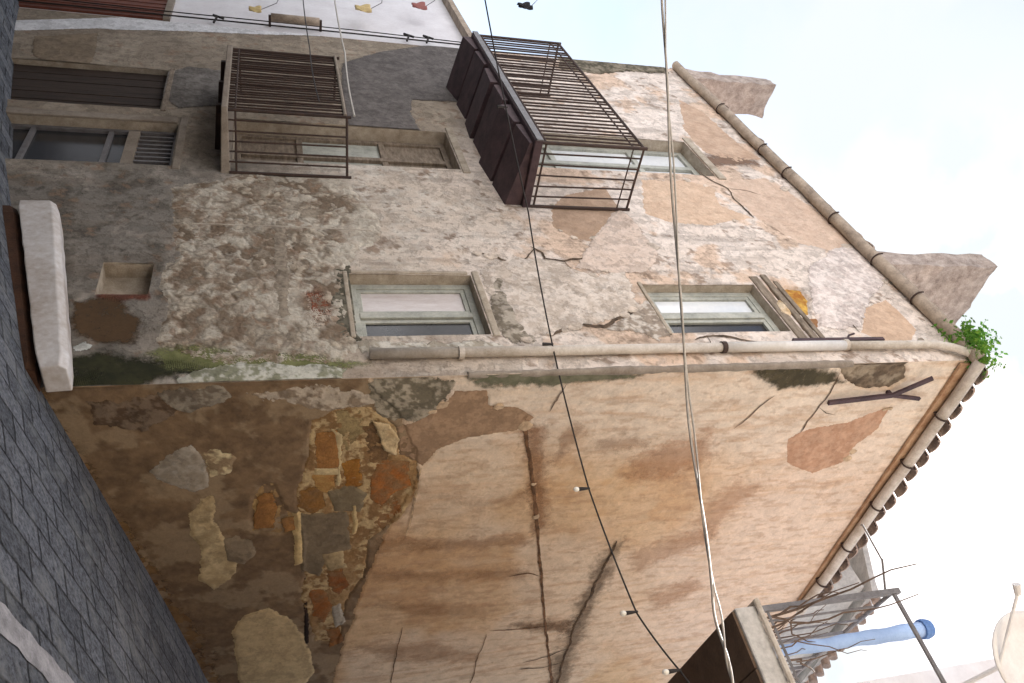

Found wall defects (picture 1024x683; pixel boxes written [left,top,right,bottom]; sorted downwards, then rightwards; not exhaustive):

crack [692,166,754,217]
crack [472,246,583,264]
flaking render [480,178,916,343]
crack [552,306,638,336]
damp [176,362,347,383]
crack [800,373,840,433]
peeling [787,407,893,473]
flaking render [41,378,534,683]
crack [470,386,617,683]